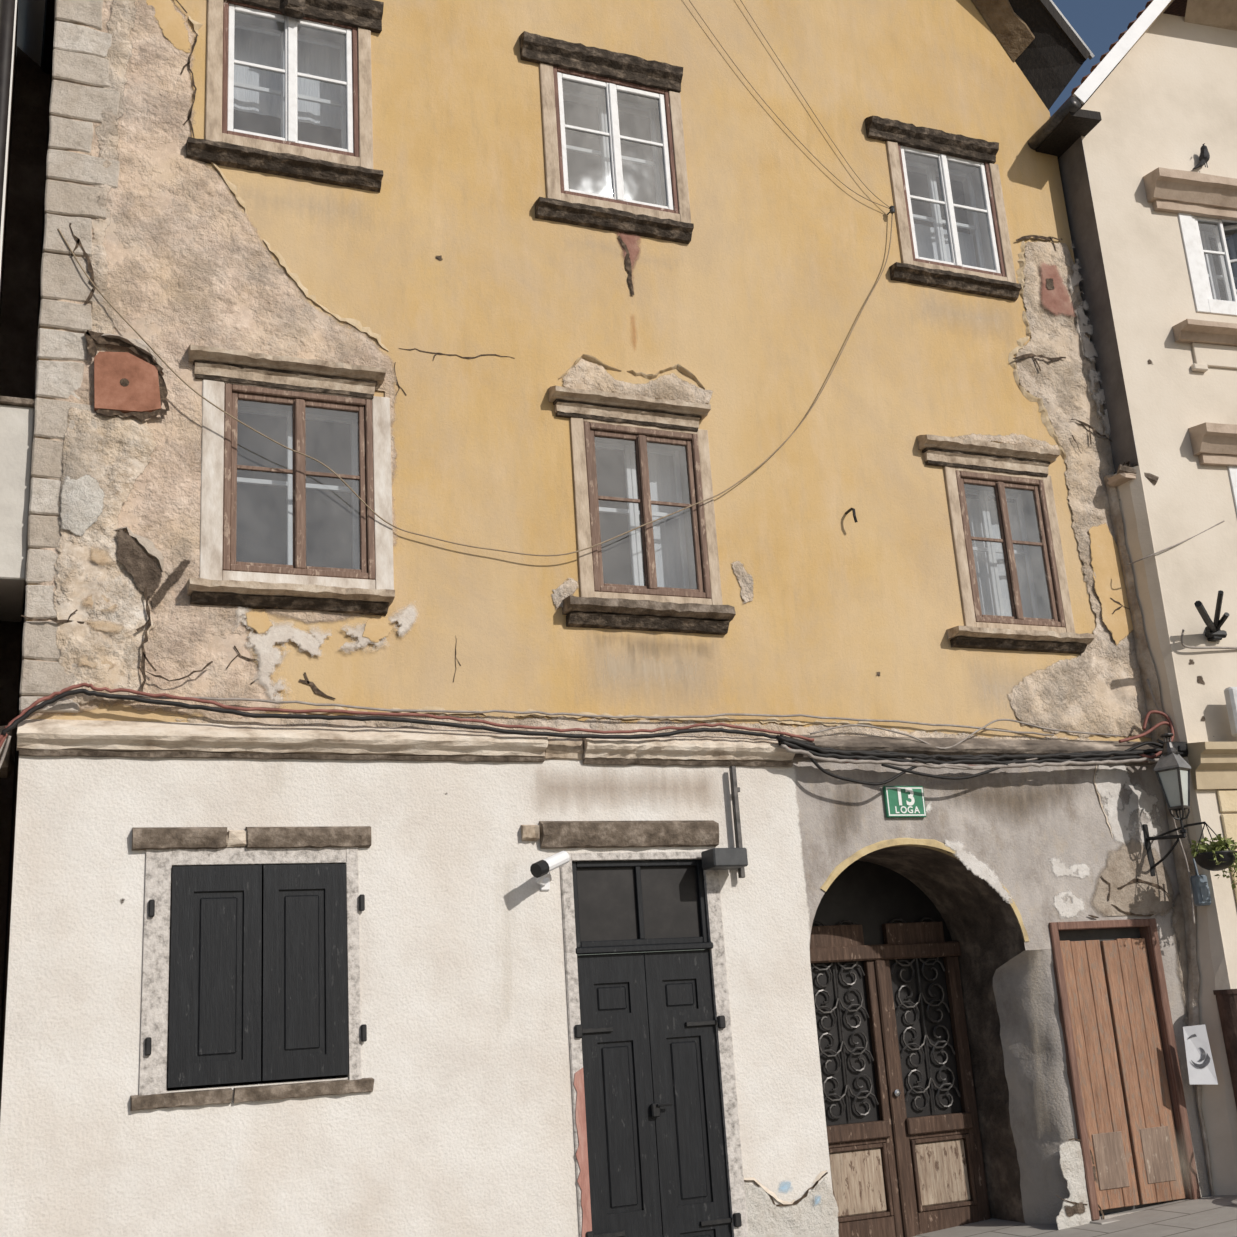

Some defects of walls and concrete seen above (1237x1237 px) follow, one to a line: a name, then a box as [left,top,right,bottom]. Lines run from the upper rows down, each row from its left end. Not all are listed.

crack [176,0,198,138]
rust [617,232,640,295]
crack [394,348,513,397]
flaking render [30,0,1152,741]
crack [136,586,260,692]
spalling [1049,764,1200,1026]